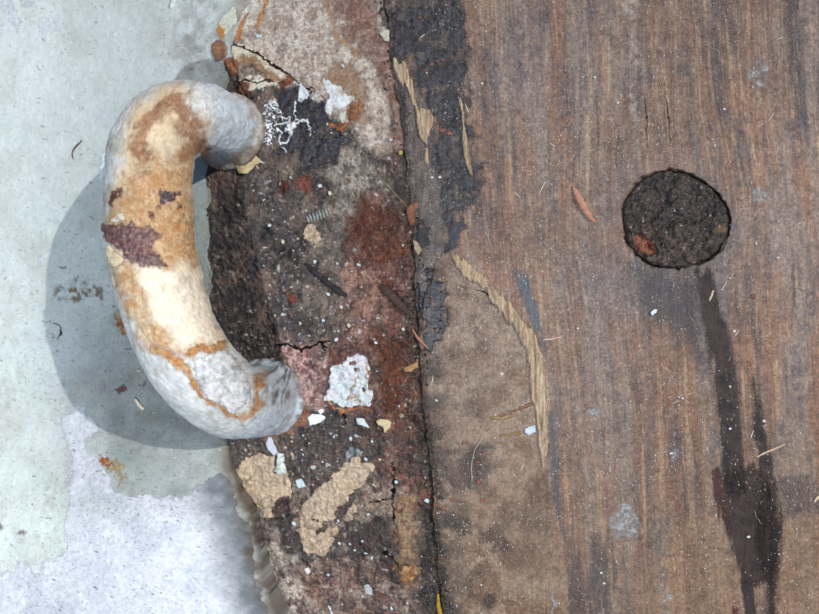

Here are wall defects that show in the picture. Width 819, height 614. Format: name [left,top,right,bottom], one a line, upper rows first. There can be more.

crack [230,42,327,102]
peeling [0,405,375,614]
corrosion [99,0,443,614]
peeling [308,353,392,433]
leakage [630,262,782,614]